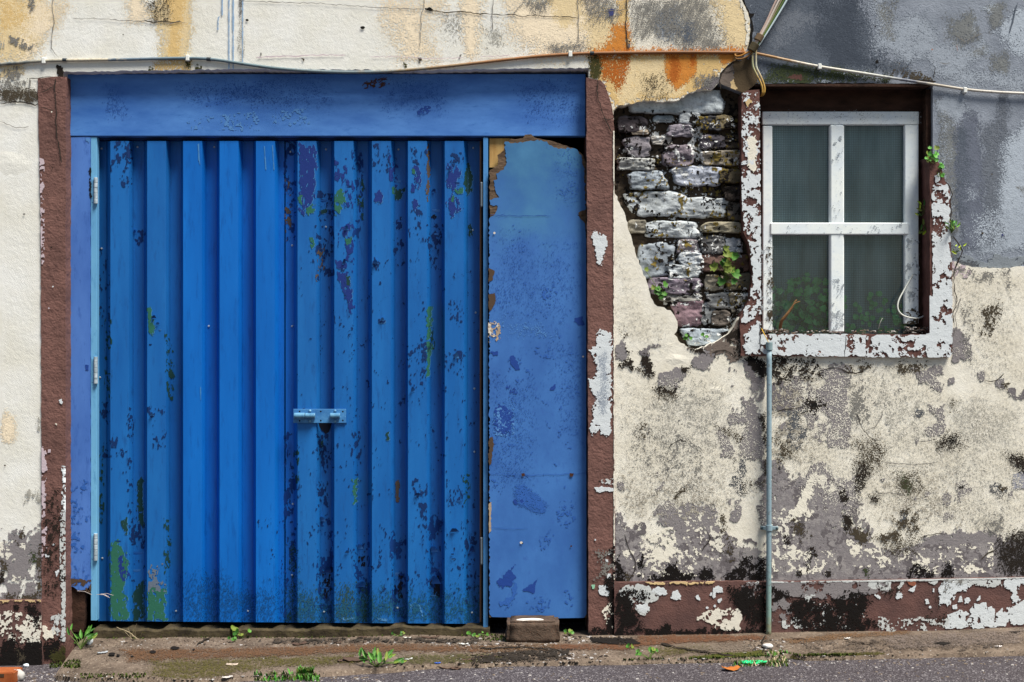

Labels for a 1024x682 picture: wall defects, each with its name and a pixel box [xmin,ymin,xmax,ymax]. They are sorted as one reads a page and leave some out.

rust [588,21,746,93]
leakage [369,0,1024,290]
peeling [588,0,1024,632]
peeling [0,523,42,599]
leakage [589,358,969,636]
mould [980,514,1024,577]